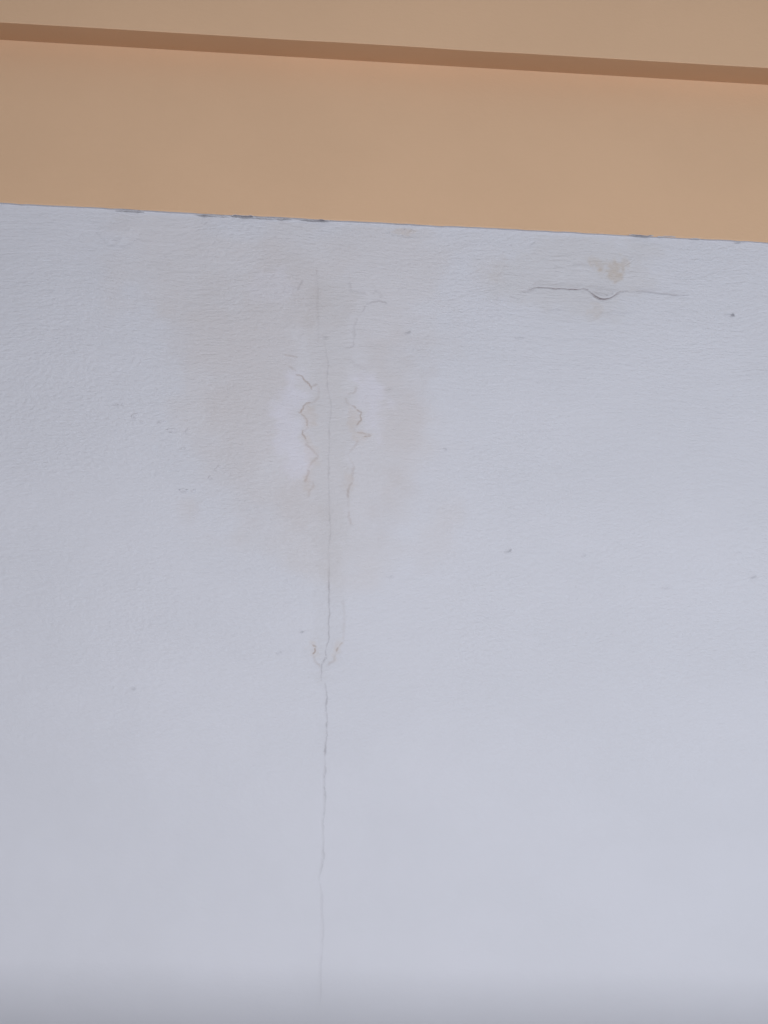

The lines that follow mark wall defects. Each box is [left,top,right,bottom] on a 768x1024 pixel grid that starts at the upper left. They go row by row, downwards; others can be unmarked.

crack [316,267,332,1006]
leakage [87,212,681,689]
crack [509,281,589,311]